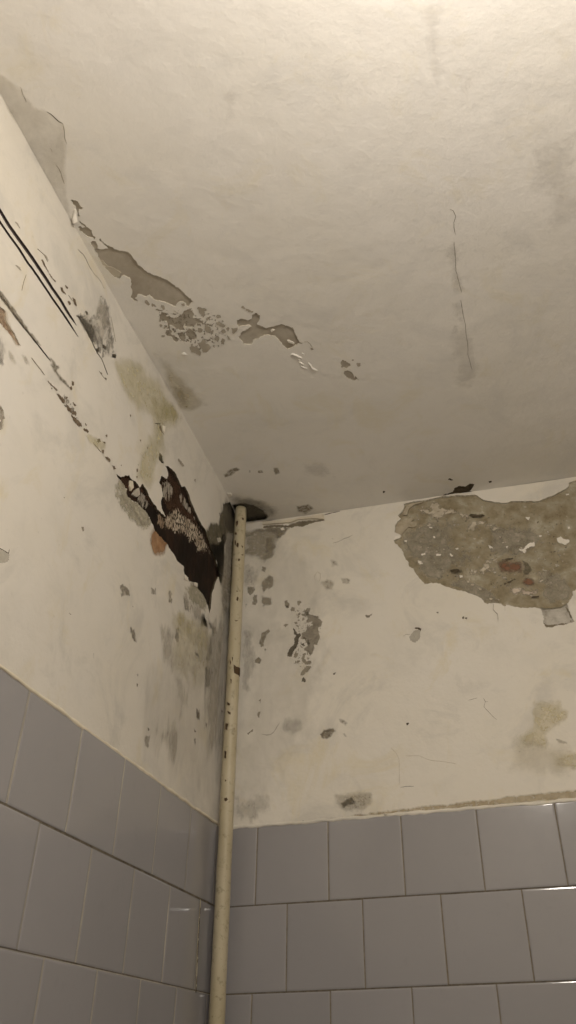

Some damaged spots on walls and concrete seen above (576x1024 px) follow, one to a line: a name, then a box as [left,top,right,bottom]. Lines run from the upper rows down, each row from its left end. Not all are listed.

crack [0,212,72,325]
spalling [38,249,116,379]
spalling [72,200,314,356]
spalling [32,358,219,609]
damp [116,480,151,526]
damp [184,583,207,616]
damp [206,493,278,610]
peeling [284,600,322,682]
spalling [394,478,576,628]